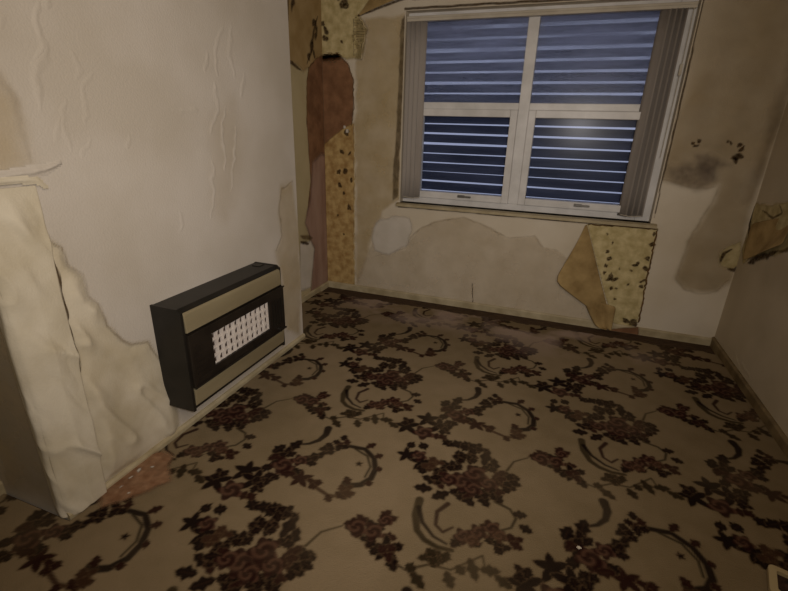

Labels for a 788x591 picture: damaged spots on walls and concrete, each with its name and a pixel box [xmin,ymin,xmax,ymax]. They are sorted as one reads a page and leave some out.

spalling [287,0,402,291]
crack [54,261,81,372]
leakage [366,216,412,255]
peeling [557,224,658,330]
peeling [720,202,788,271]